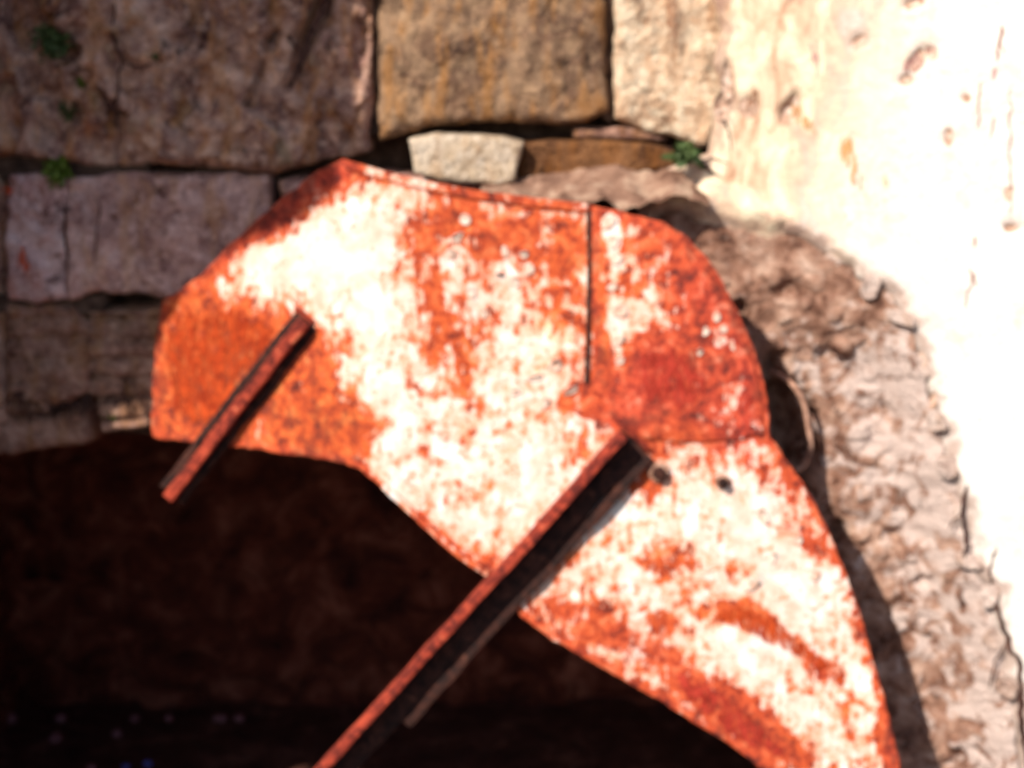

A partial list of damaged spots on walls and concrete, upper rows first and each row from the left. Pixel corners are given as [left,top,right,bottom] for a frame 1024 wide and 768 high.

corrosion [166,308,274,423]
spalling [659,213,1019,768]
corrosion [717,607,843,686]
corrosion [675,673,783,757]